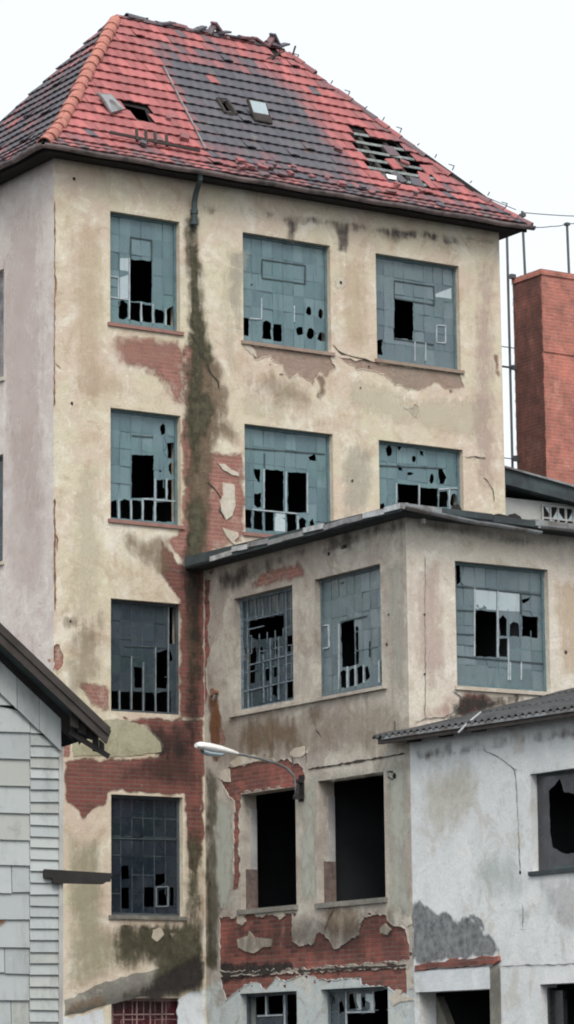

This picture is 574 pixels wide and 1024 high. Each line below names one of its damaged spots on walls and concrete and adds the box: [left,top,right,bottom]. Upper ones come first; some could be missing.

leakage [188,247,233,556]
peeling [243,344,465,419]
spalling [64,338,308,890]
crack [483,749,520,865]
leakage [116,926,181,965]
spalling [219,904,414,1006]